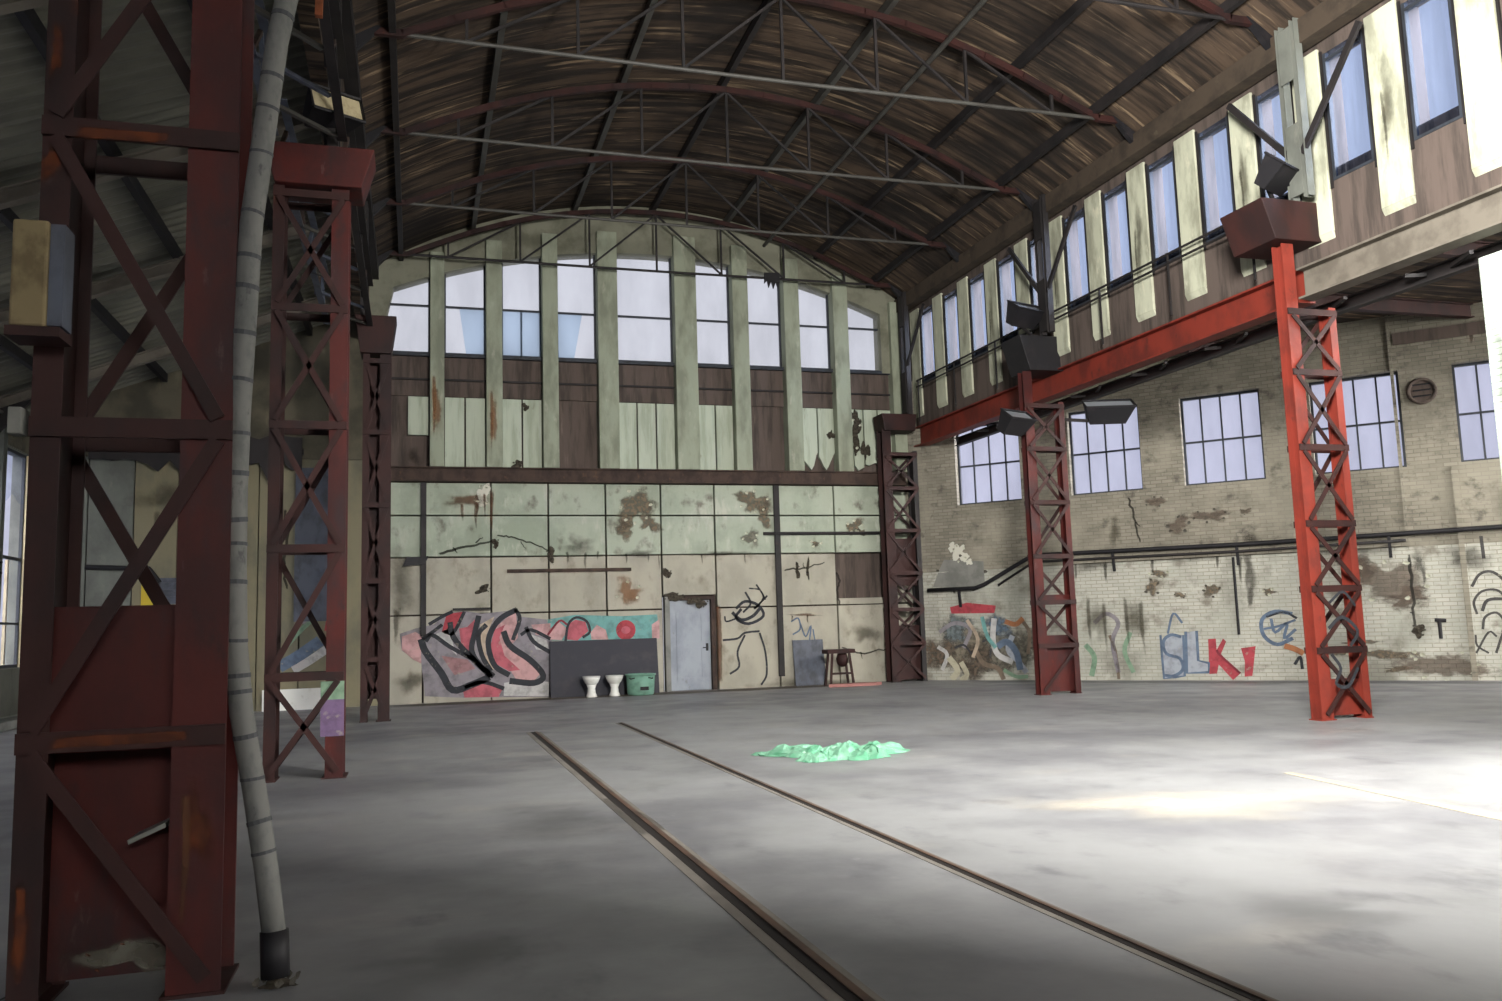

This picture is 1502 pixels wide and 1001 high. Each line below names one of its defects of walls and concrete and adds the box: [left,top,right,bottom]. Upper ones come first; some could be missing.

peeling [617,487,661,541]
peeling [735,490,770,543]
peeling [1358,556,1431,609]
peeling [1366,624,1487,681]
corrosion [51,732,186,748]
corrosion [12,889,27,975]